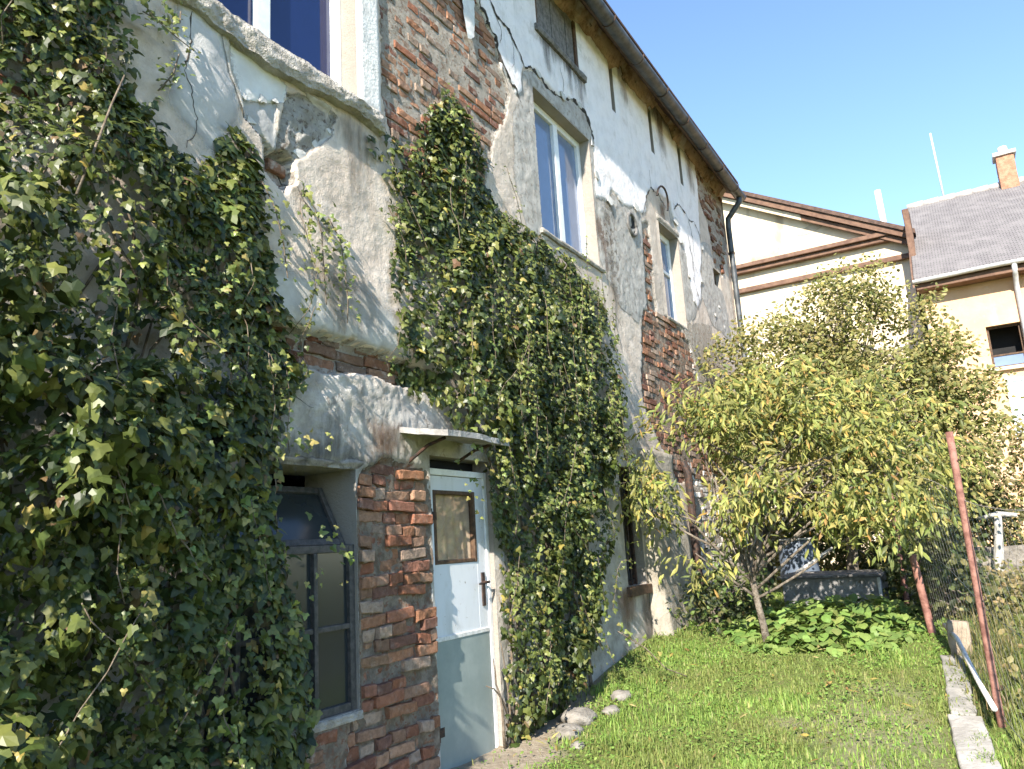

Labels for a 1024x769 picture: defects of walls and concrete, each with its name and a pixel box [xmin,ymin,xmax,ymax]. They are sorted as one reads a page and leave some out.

crack [174,12,198,148]
spalling [222,34,336,193]
crack [479,0,594,147]
flaking render [219,315,438,396]
flaking render [378,0,741,607]